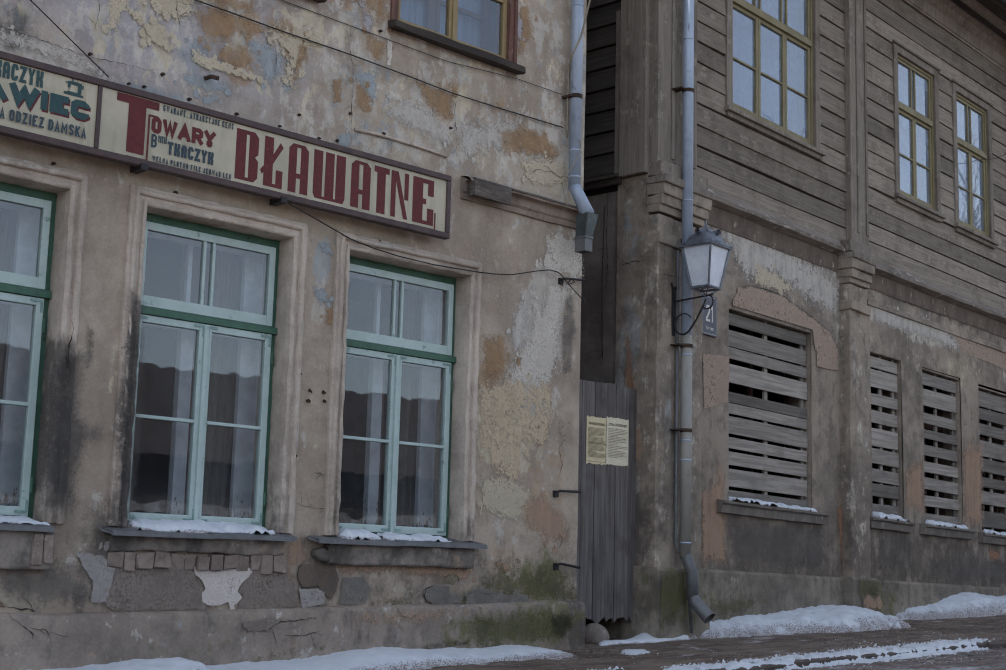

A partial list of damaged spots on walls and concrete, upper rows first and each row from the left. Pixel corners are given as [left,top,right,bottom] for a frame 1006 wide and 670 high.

peeling [0,25,105,76]
peeling [101,0,323,104]
peeling [333,77,372,112]
peeling [340,0,393,65]
peeling [385,83,569,187]
peeling [517,4,538,56]
leakage [45,331,96,512]
peeling [476,283,557,521]
peeling [77,541,529,632]